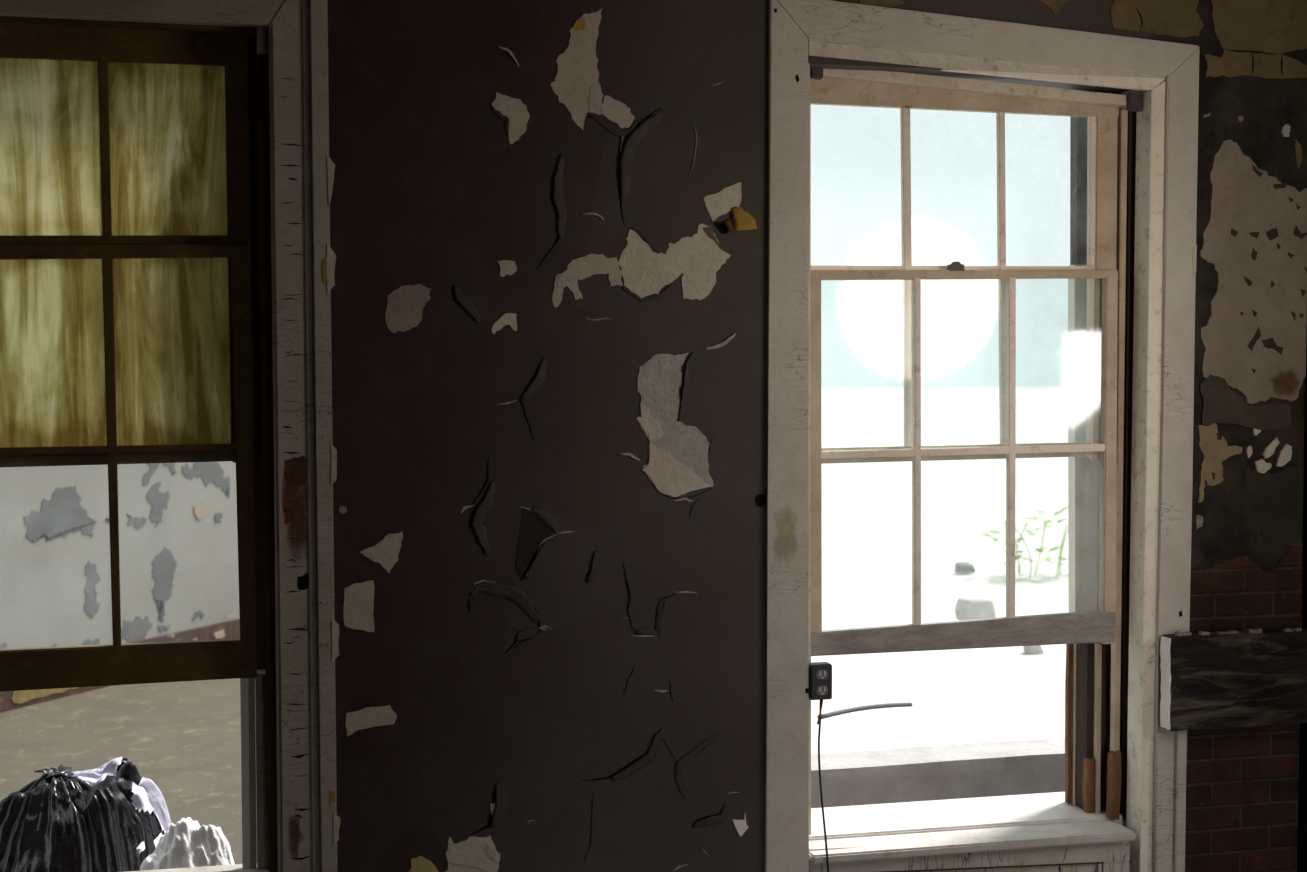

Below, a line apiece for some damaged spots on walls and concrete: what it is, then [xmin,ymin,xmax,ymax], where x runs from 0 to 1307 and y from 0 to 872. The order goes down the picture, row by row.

peeling [490,92,530,144]
peeling [550,8,637,156]
peeling [552,183,757,307]
crack [498,357,547,440]
peeling [618,333,736,518]
flaking render [1246,428,1292,474]
peeling [23,486,109,543]
peeling [127,462,230,529]
peeling [121,547,177,642]
spalling [11,687,78,704]
crack [461,460,740,871]
peeling [408,836,500,872]